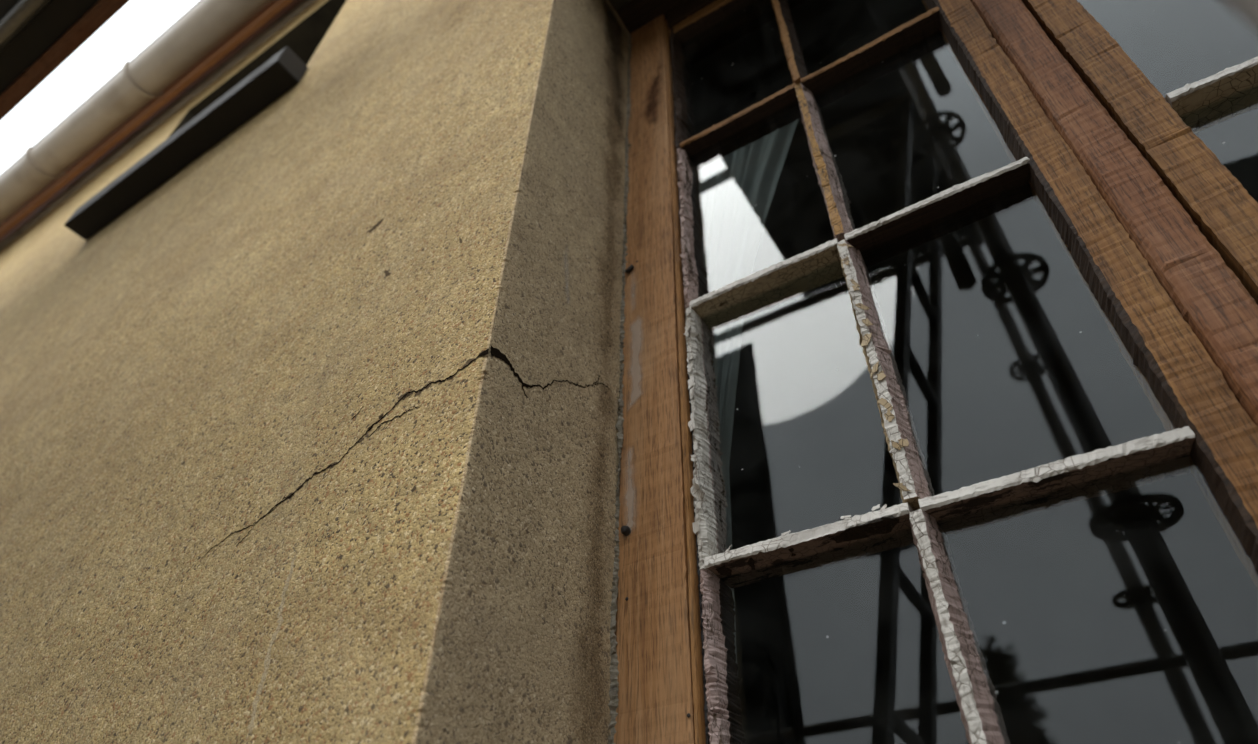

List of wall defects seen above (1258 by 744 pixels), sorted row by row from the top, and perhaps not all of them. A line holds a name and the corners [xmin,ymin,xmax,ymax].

crack [201,345,609,559]